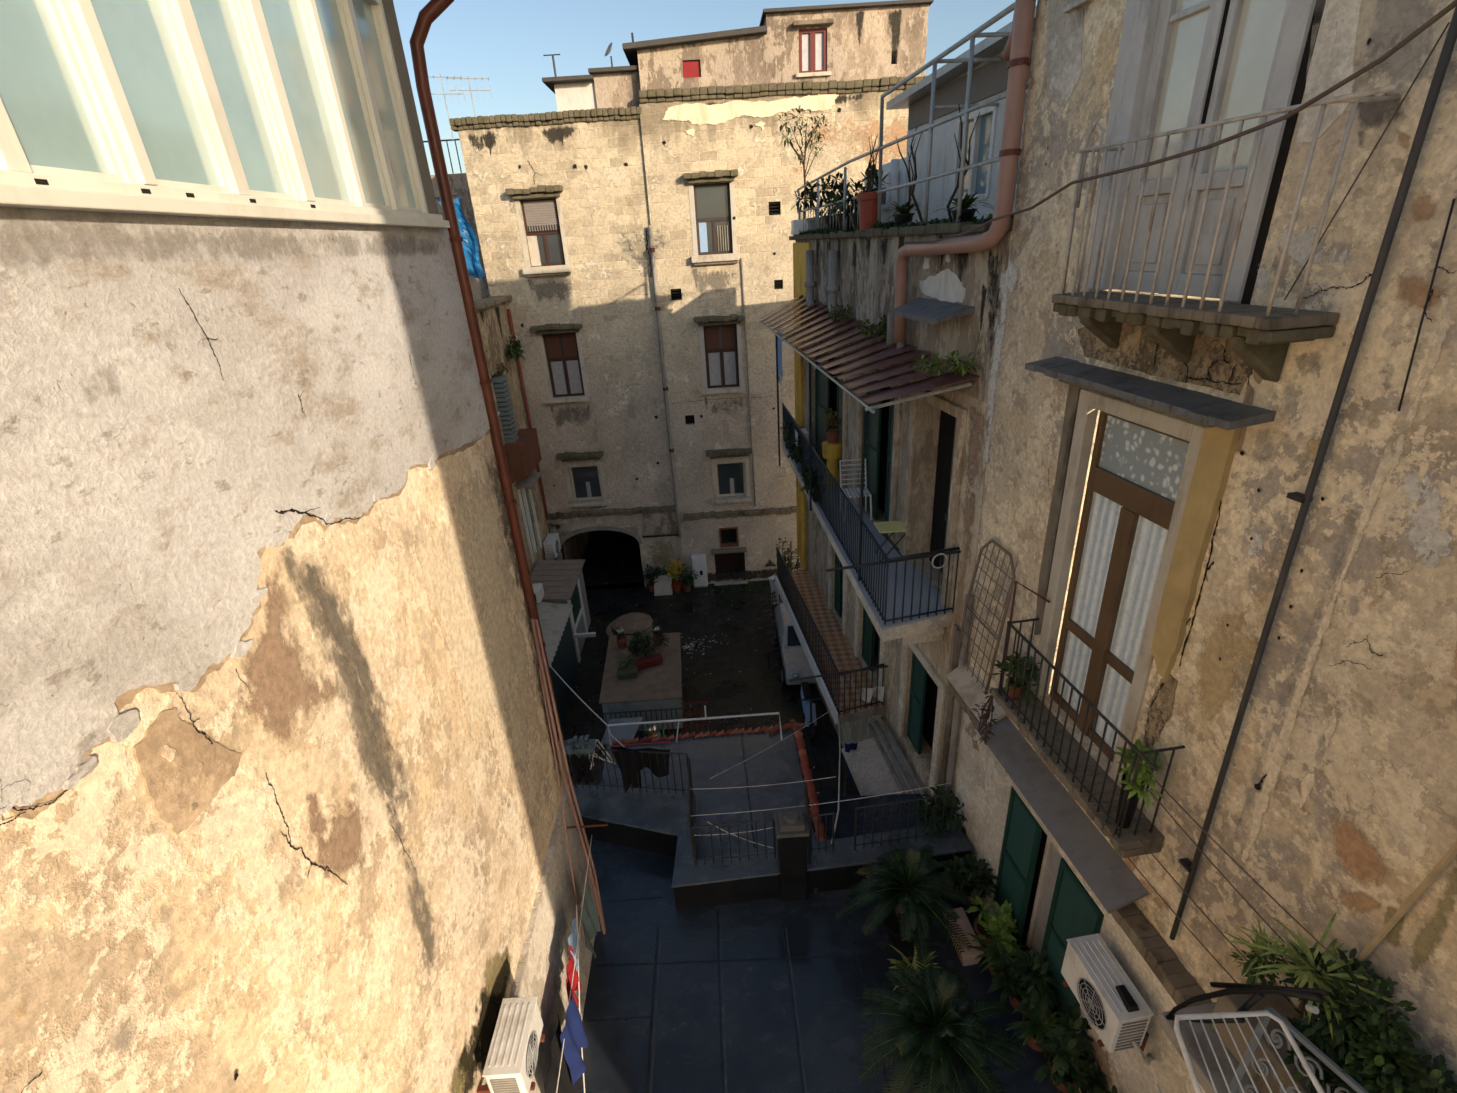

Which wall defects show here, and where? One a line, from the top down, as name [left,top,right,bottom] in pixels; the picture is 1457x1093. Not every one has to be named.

flaking render [663,94,841,136]
flaking render [919,254,966,303]
crack [179,289,224,381]
flaking render [0,207,500,836]
peeling [1403,472,1452,566]
damp [238,551,409,838]
crack [0,779,69,826]
crack [265,773,348,885]
damp [307,794,364,877]
damp [407,863,434,972]
mould [453,950,511,1093]